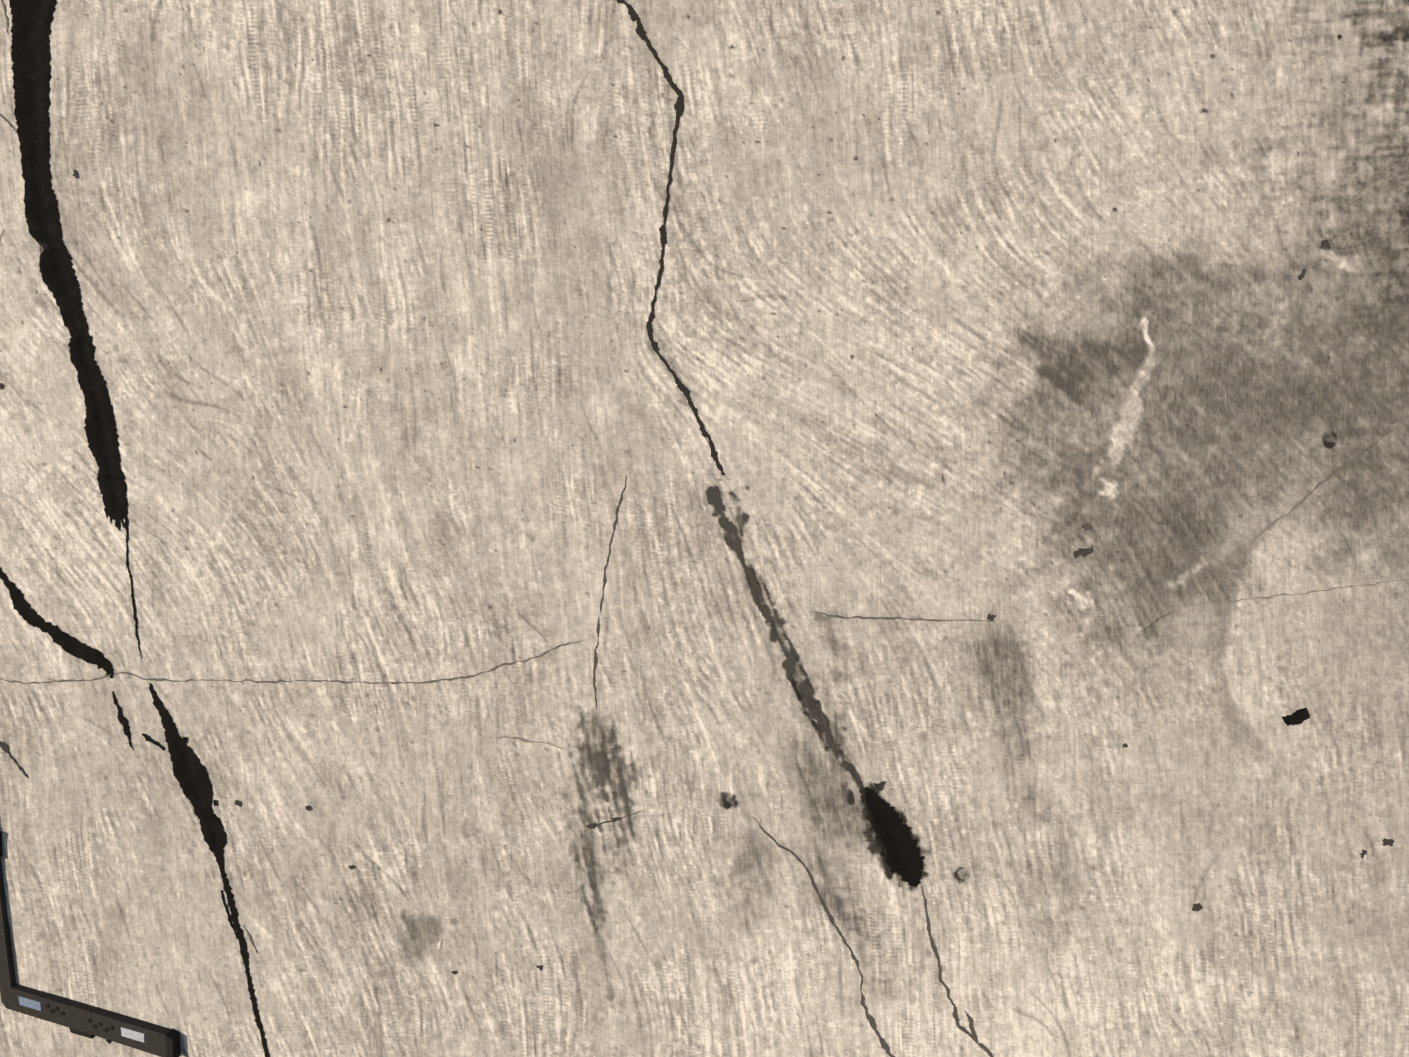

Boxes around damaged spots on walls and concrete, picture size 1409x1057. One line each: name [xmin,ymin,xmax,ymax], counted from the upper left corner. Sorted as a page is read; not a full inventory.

crack [0,0,626,1057]
crack [617,0,992,805]
crack [758,823,895,1057]
crack [921,887,993,1057]